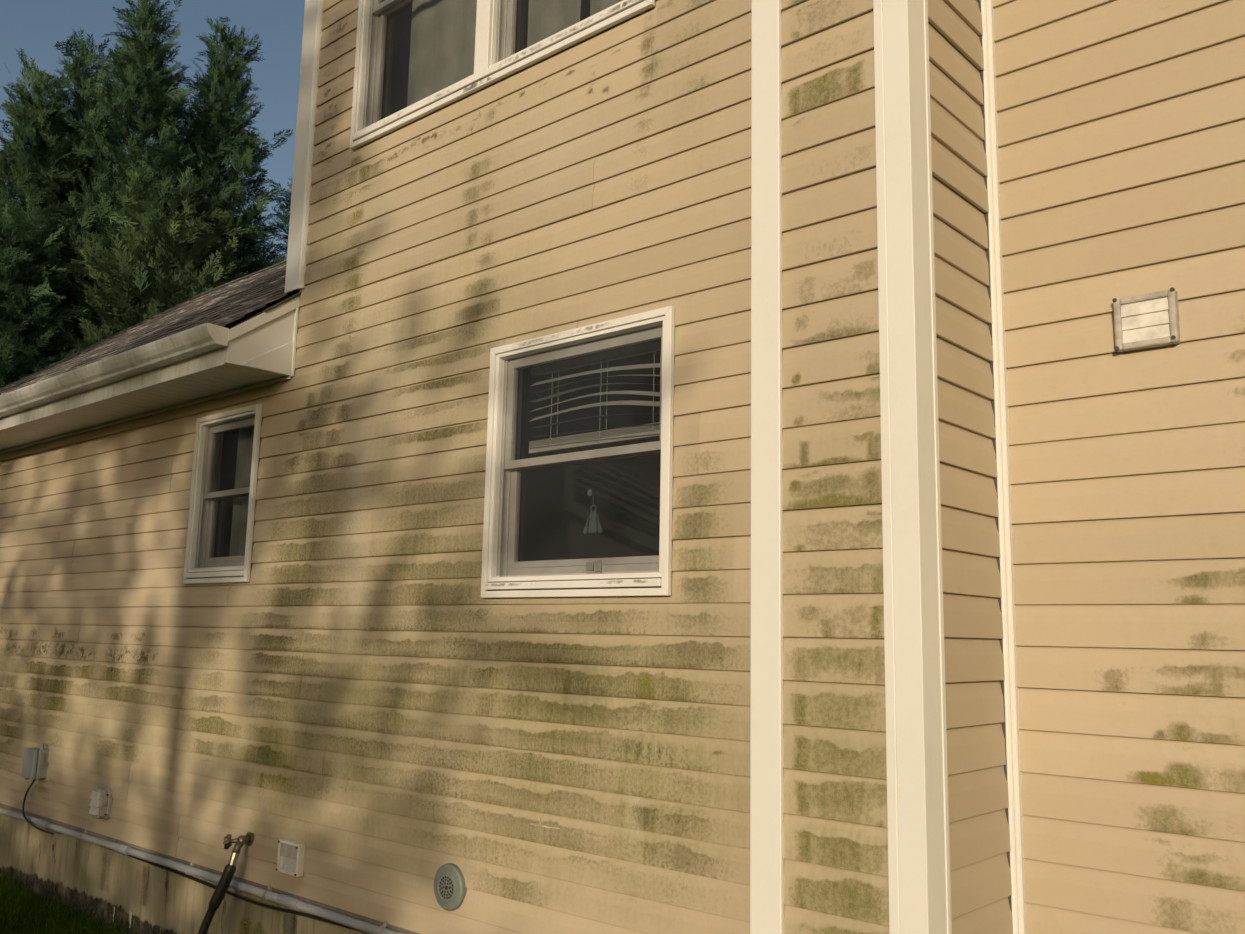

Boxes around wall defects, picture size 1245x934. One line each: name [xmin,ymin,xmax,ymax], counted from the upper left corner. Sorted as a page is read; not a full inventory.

damp [410,424,471,441]
damp [792,443,877,509]
damp [1185,573,1209,604]
damp [30,633,91,711]
damp [107,635,148,700]
damp [257,625,301,707]
damp [514,631,619,746]
damp [599,673,654,699]
damp [795,696,807,809]
damp [1138,765,1201,789]
damp [1157,726,1190,741]
damp [1189,872,1227,889]